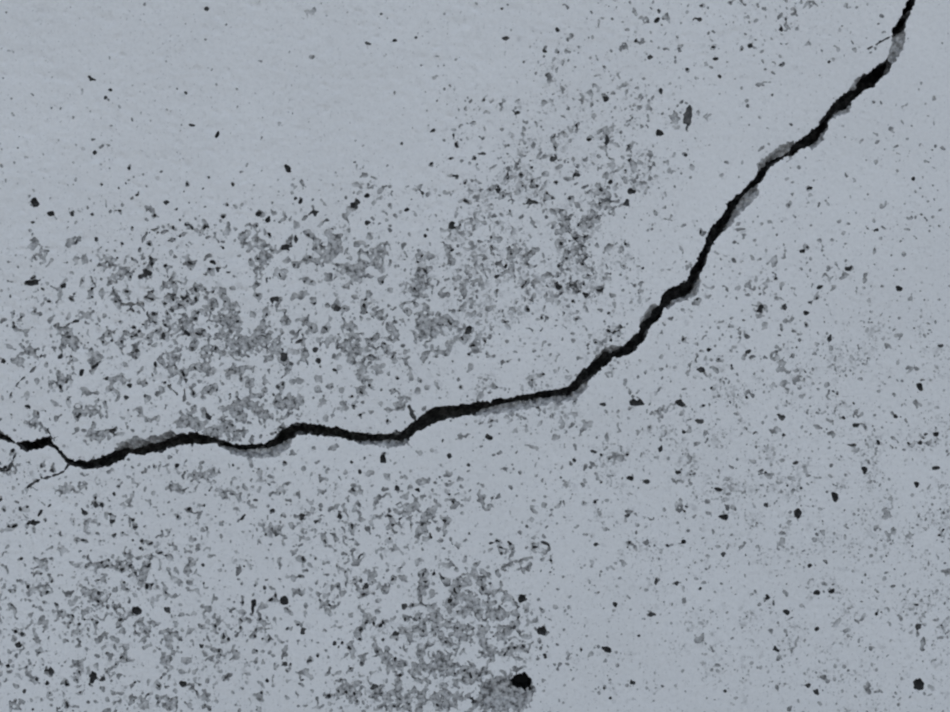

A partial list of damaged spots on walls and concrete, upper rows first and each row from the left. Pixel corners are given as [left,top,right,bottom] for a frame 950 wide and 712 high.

crack [0,0,915,489]
crack [27,504,51,525]